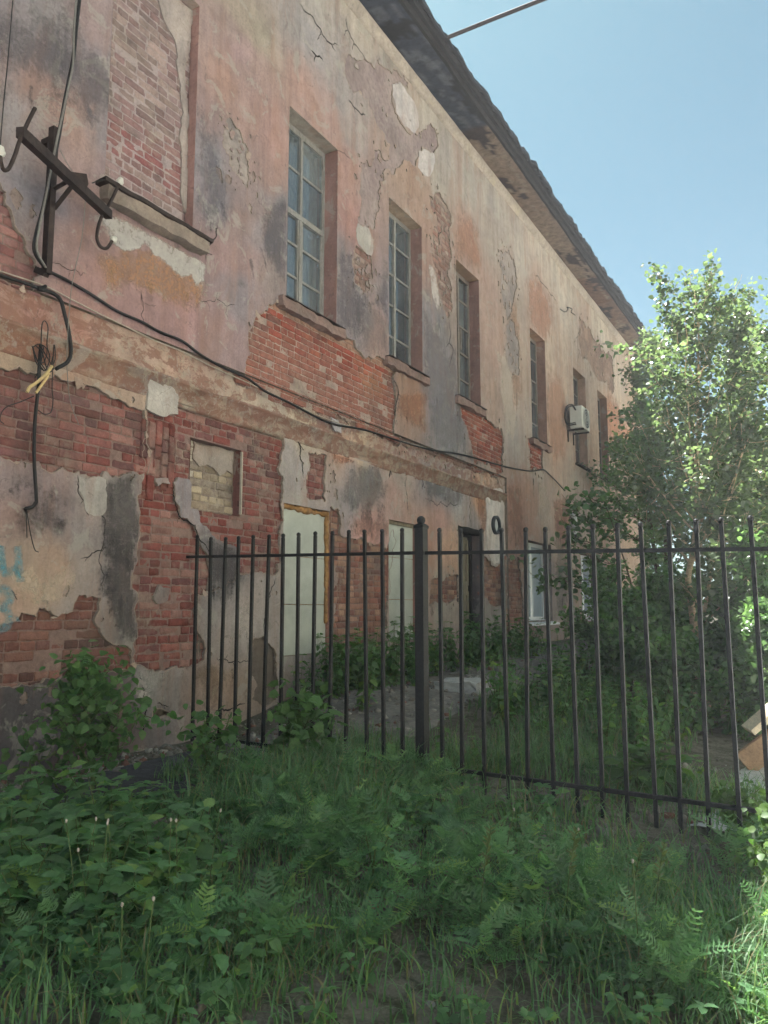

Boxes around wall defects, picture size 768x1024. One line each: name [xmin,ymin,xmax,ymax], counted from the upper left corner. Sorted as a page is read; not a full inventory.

crack [301,5,367,61]
peeling [99,216,205,285]
spalling [344,54,439,313]
spalling [426,187,455,318]
spalling [232,300,504,483]
water stain [103,478,139,638]
spalling [0,365,285,707]
spalling [306,449,396,649]